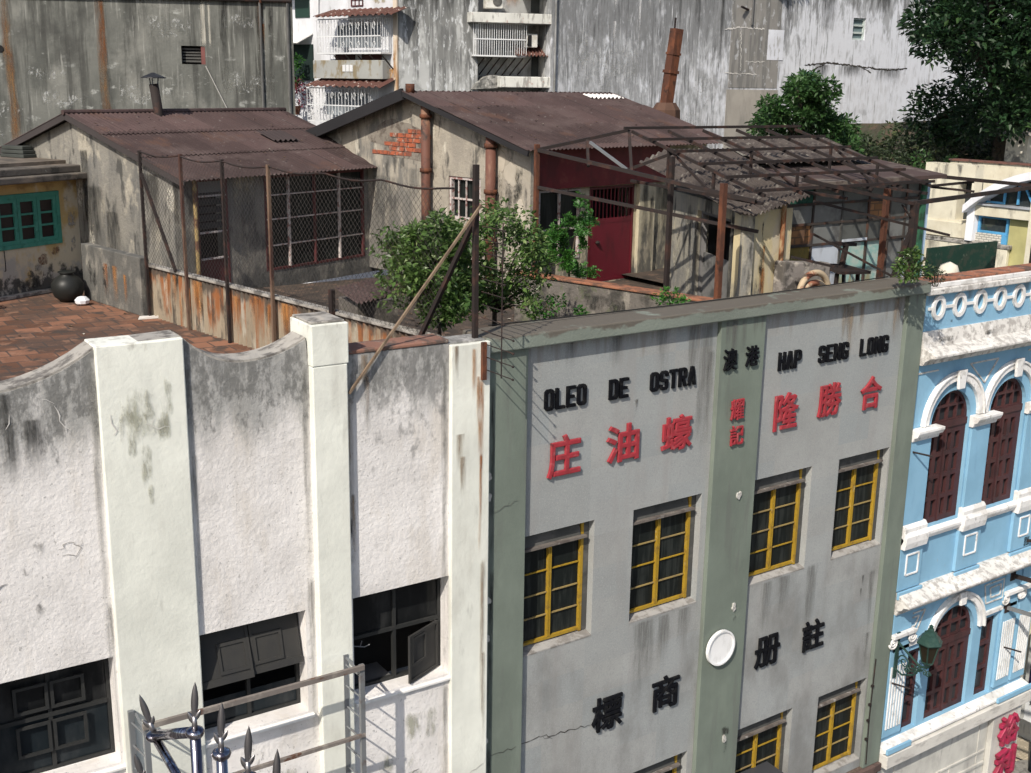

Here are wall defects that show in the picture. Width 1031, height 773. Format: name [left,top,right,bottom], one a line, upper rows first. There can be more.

leakage [201,2,240,48]
crack [805,62,907,73]
spalling [368,119,431,162]
leakage [2,395,39,455]
crack [470,725,589,773]